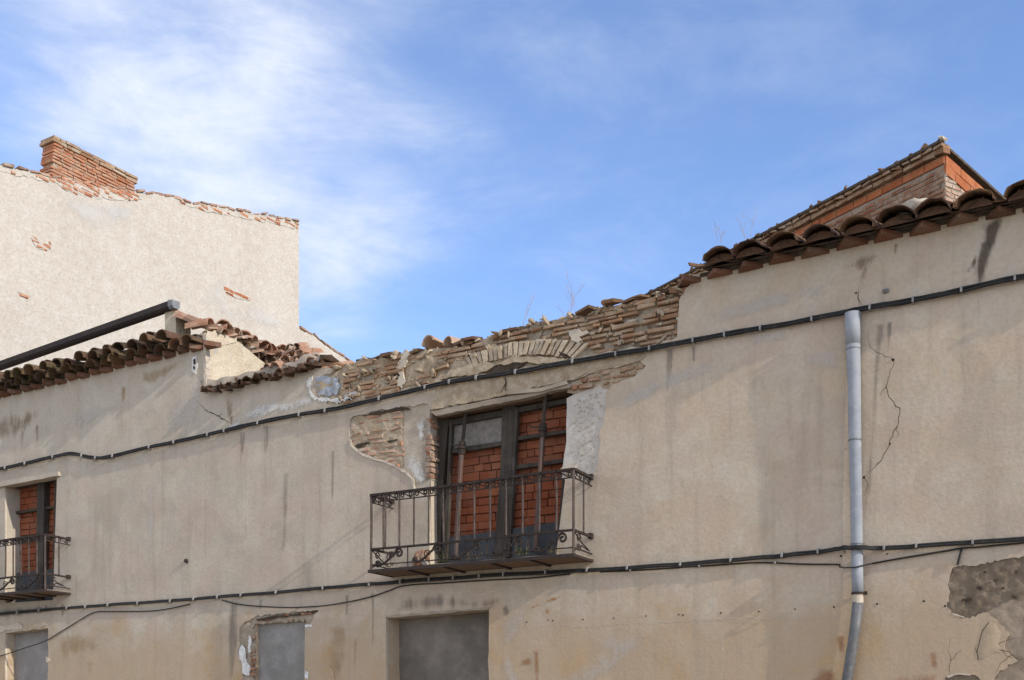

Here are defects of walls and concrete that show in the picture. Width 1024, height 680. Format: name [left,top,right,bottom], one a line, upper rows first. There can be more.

spalling [0,167,141,201]
spalling [32,236,51,251]
spalling [179,200,299,230]
damp [973,220,999,281]
spalling [224,286,250,301]
spalling [349,353,645,489]
crack [863,340,900,498]
spalling [239,610,318,680]
spalling [947,556,1024,680]